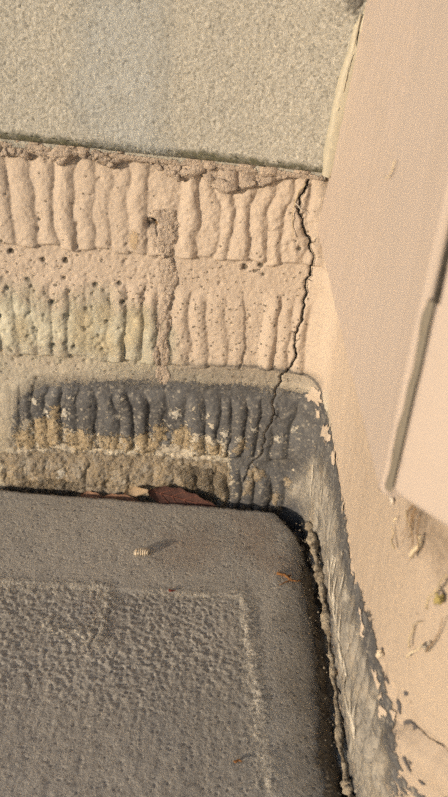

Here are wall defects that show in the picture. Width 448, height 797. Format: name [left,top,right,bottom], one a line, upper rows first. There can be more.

crack [245,179,315,478]
peeling [305,387,335,466]
spalling [0,448,232,508]
spalling [242,467,267,497]
spalling [270,477,293,509]
peeling [371,669,421,730]